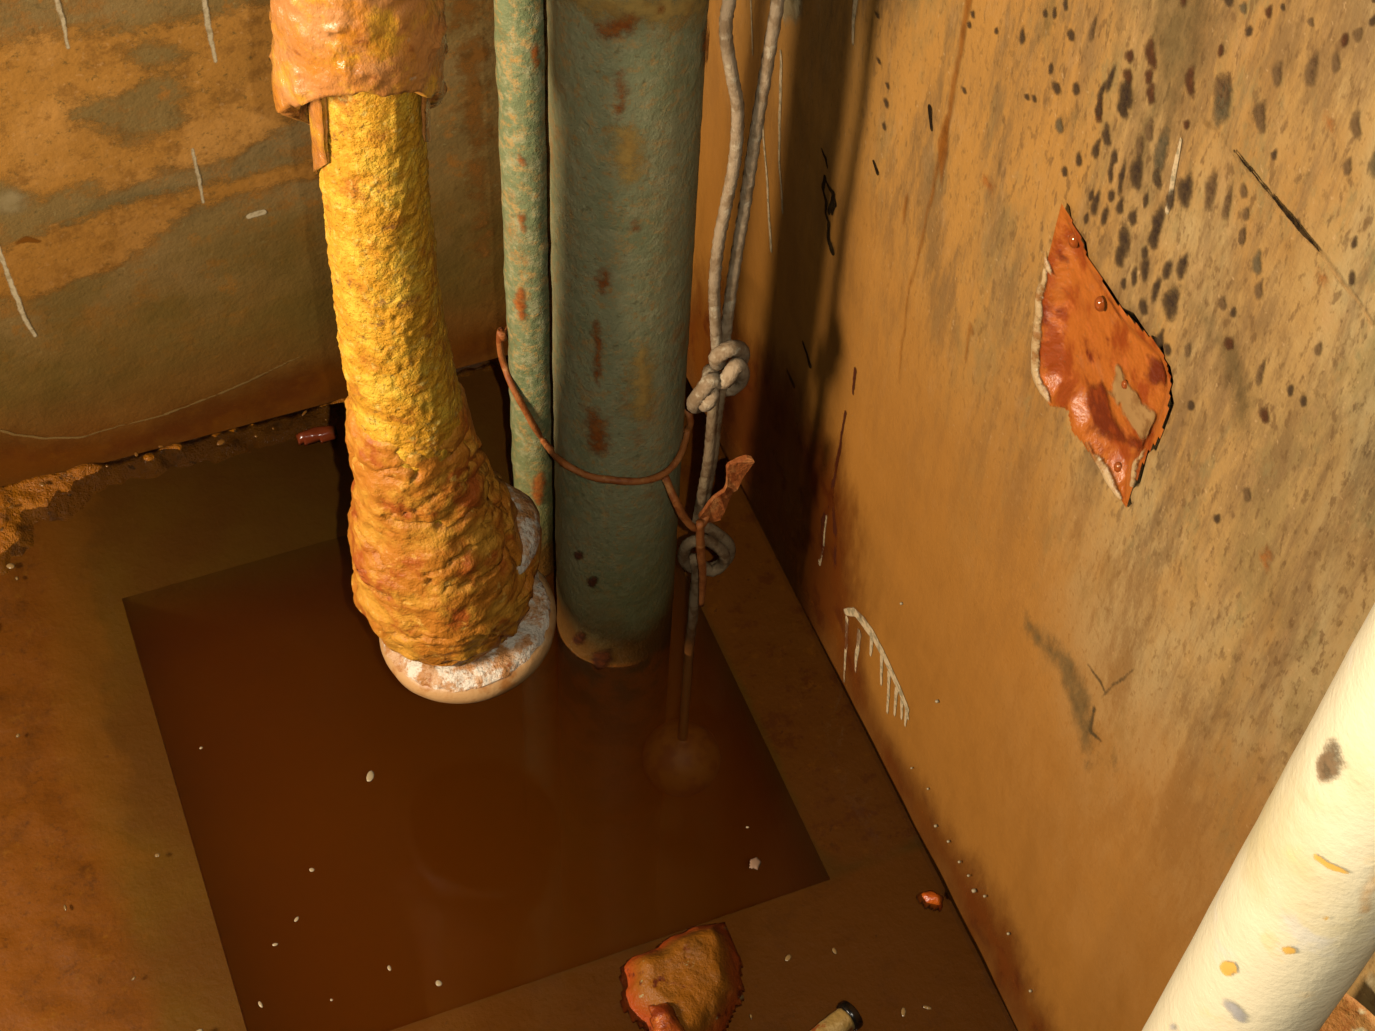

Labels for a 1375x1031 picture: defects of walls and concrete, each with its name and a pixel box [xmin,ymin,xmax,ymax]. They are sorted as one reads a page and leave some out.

spalling [1067,17,1096,41]
spalling [1225,0,1252,36]
spalling [1305,0,1375,85]
spalling [1272,63,1281,86]
spalling [1253,104,1264,129]
spalling [1350,112,1360,137]
crack [1232,150,1370,321]
spalling [1031,39,1248,507]
spalling [1252,251,1262,299]
spalling [1256,362,1264,385]